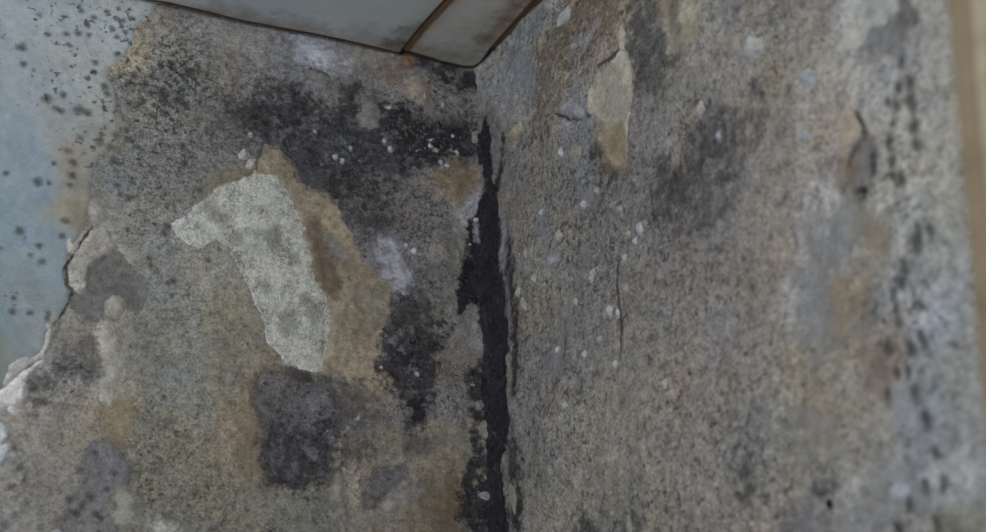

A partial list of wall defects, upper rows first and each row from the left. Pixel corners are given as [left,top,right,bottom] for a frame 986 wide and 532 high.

leakage [248,72,316,137]
leakage [287,33,363,131]
leakage [410,56,477,91]
peeling [0,0,163,468]
flaking render [170,144,395,385]
leakage [361,99,524,532]
leakage [250,367,379,512]